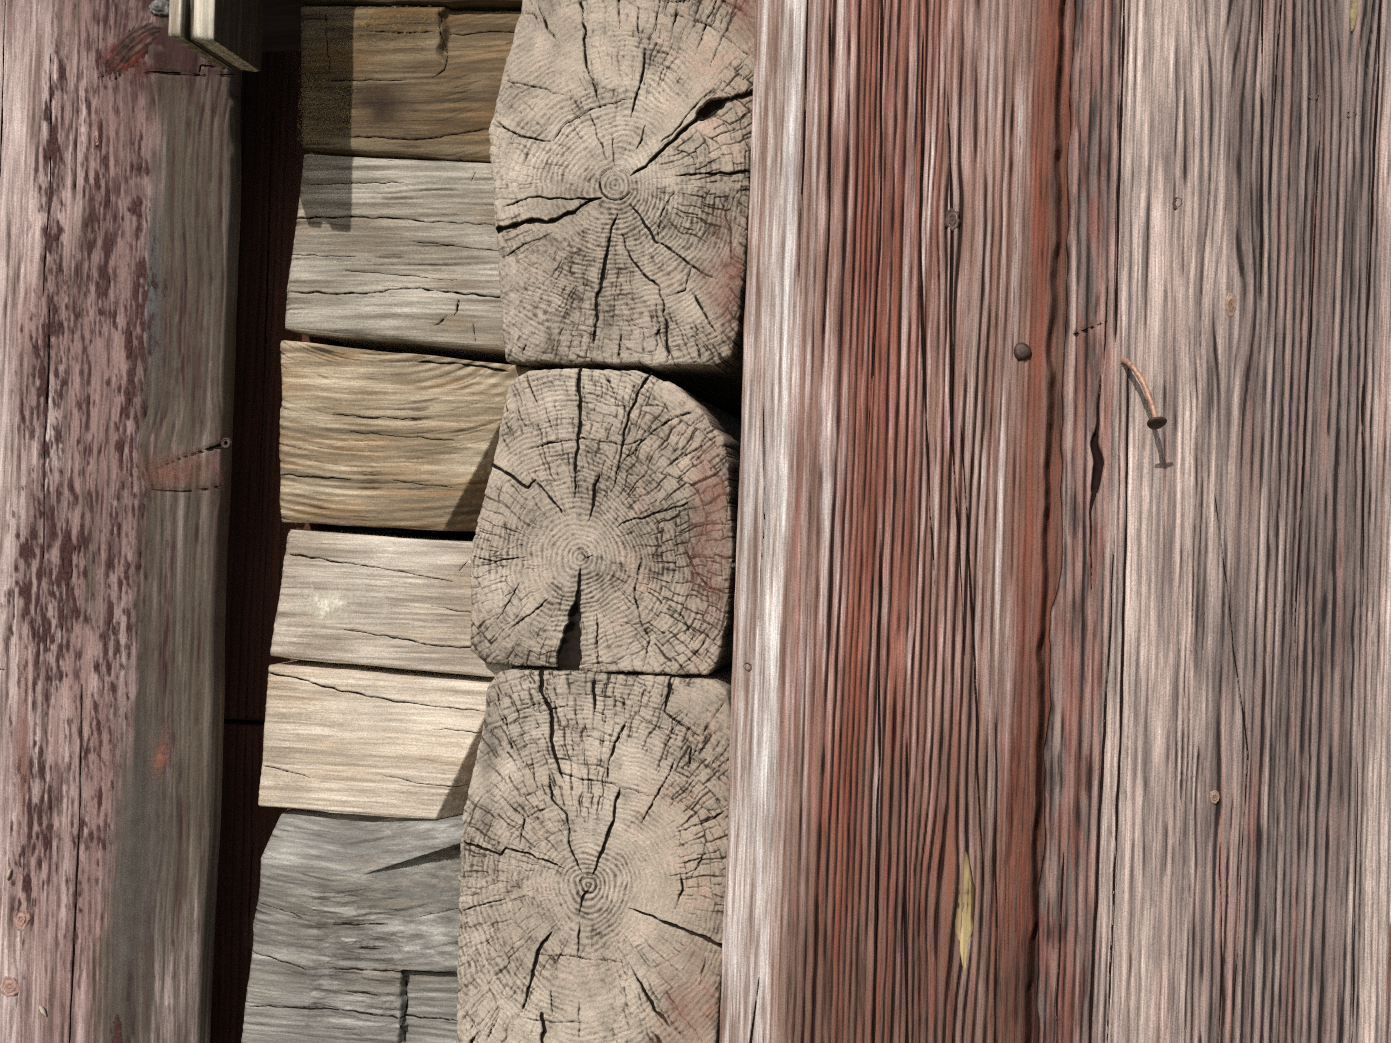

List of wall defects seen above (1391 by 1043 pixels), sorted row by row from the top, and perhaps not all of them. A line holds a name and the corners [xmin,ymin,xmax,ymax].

peeling [4,26,166,947]